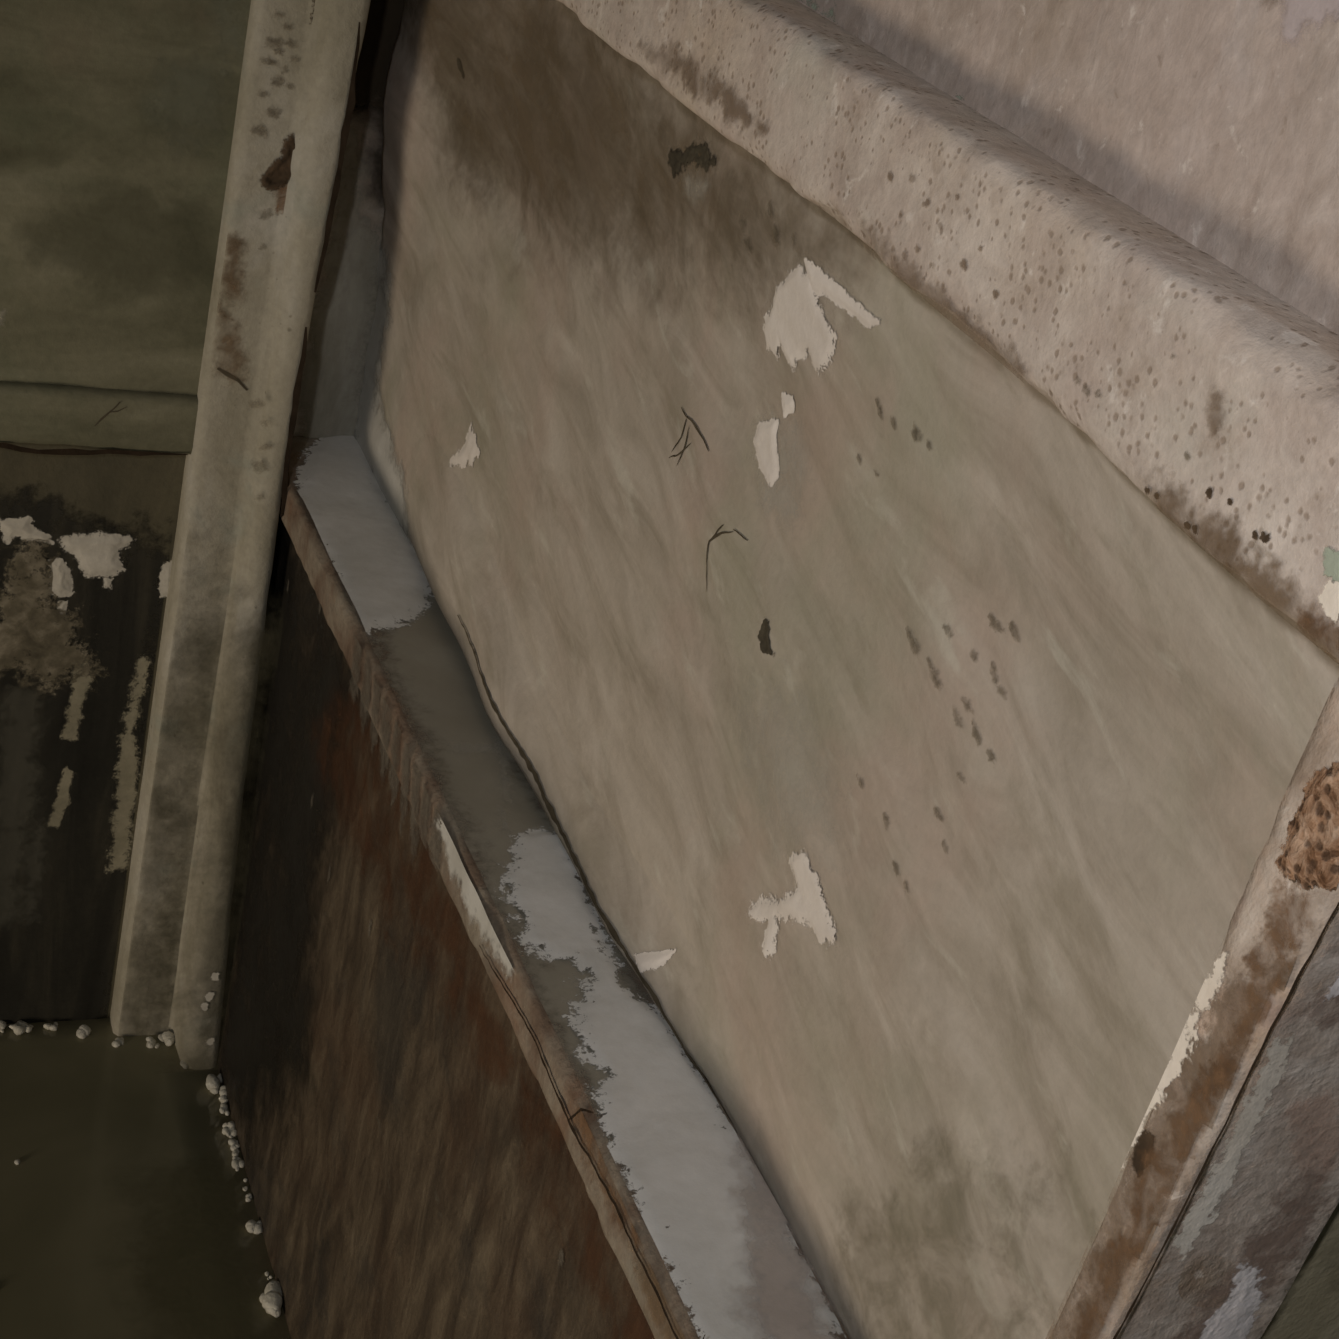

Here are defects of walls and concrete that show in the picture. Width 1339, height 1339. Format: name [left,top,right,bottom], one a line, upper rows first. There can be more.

corrosion [276,180,288,212]
corrosion [222,237,242,294]
damp [763,257,880,376]
crack [669,407,709,464]
peeling [0,515,135,695]
peeling [158,560,172,598]
crack [706,525,748,589]
damp [1157,490,1292,610]
peeling [1318,547,1339,622]
damp [201,0,846,1339]
corrosion [1213,887,1306,1087]
damp [1045,961,1295,1339]